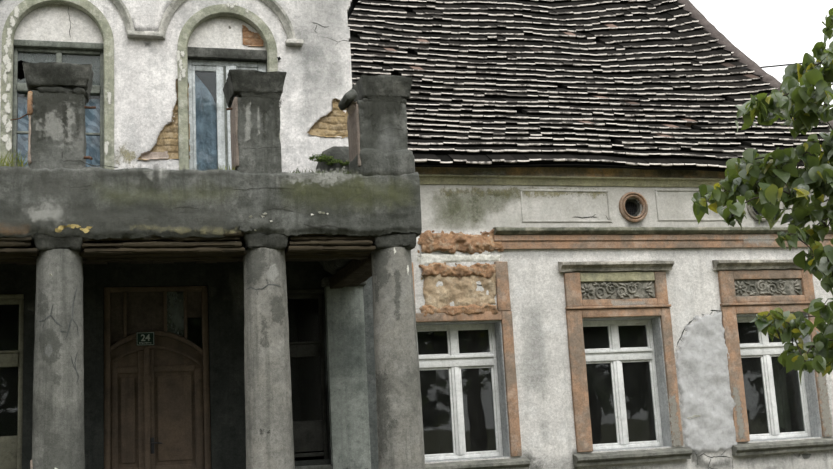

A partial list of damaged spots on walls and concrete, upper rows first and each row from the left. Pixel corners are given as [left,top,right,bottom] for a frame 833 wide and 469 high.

spalling [241,25,265,47]
spalling [136,50,190,161]
spalling [307,97,361,167]
spalling [406,228,504,316]